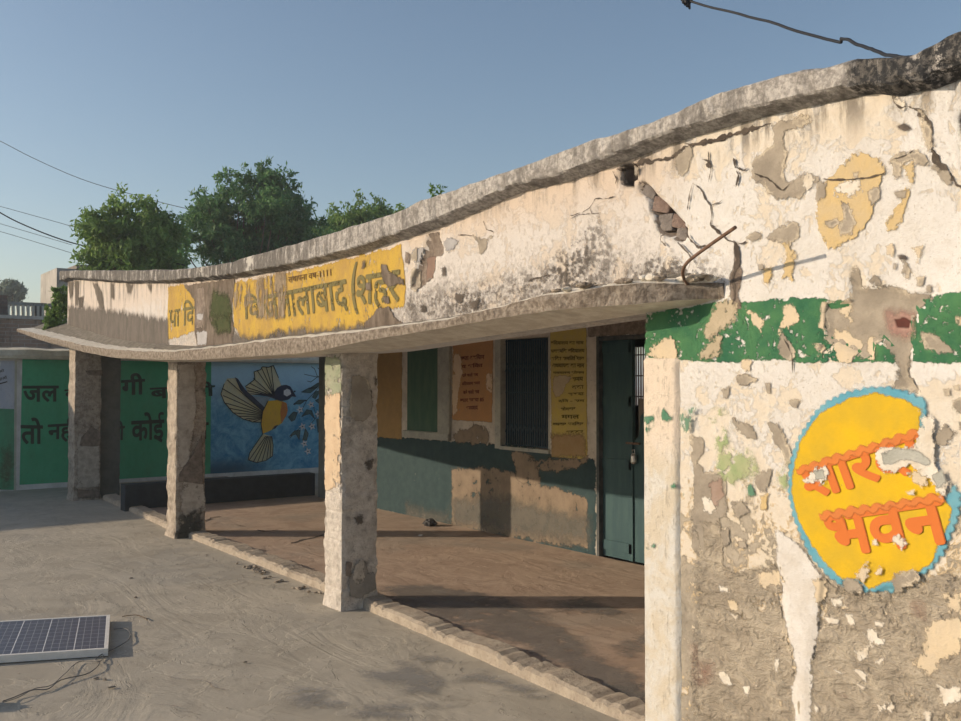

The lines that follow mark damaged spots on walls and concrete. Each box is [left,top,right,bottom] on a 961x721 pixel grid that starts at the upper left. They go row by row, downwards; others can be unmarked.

peeling [185,232,492,346]
damp [455,293,479,310]
crack [571,123,771,310]
spalling [620,163,737,285]
peeling [746,221,800,284]
peeling [777,303,799,372]
peeling [751,113,915,250]
spalling [814,243,953,394]
crack [889,96,961,188]
peeling [875,384,961,496]
peeling [451,451,590,548]
peeling [689,434,961,721]